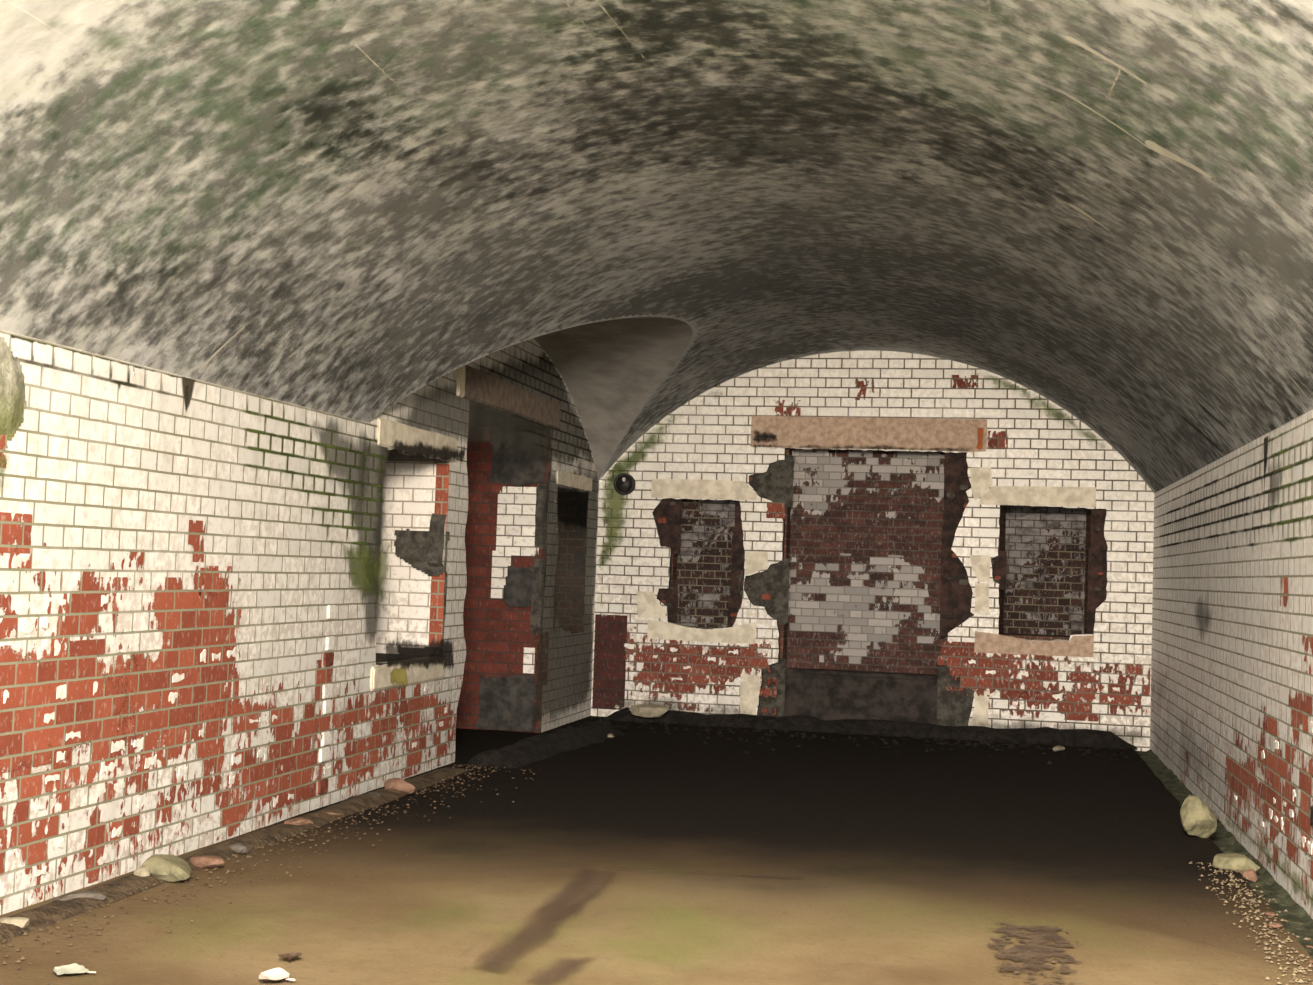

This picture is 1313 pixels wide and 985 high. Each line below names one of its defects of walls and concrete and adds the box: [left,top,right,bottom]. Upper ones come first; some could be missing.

leakage [0,0,1313,725]
peeling [766,450,945,521]
spalling [0,512,456,900]
spalling [592,614,777,715]
spalling [676,499,735,628]
peeling [788,553,1150,722]
spalling [1003,527,1086,636]
spalling [1280,577,1288,607]
spalling [1302,633,1313,676]
spalling [1223,688,1313,905]